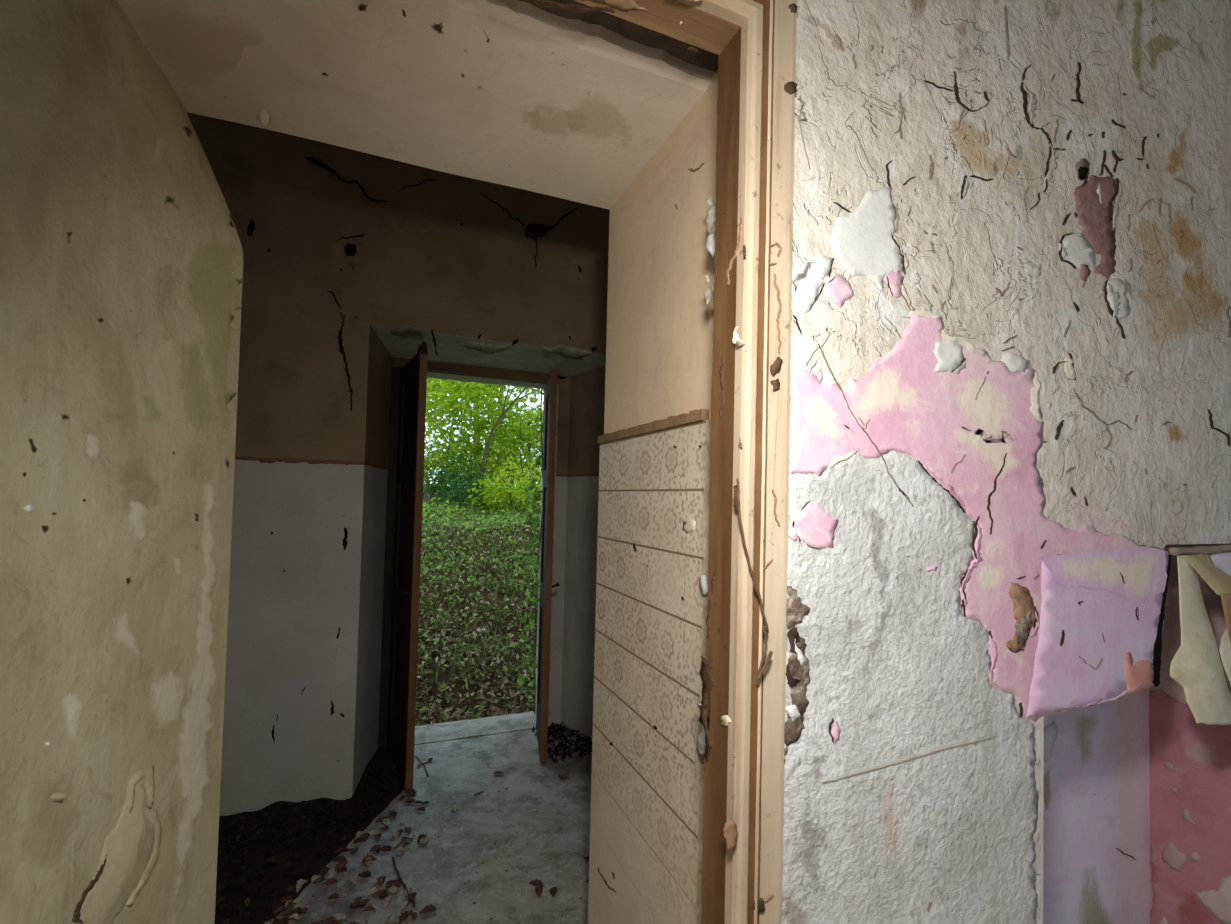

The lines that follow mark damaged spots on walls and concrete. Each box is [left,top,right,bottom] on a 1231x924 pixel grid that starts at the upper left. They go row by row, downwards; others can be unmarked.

crack [301,153,437,203]
water stain [509,86,642,159]
peeling [784,82,797,95]
water stain [801,14,857,69]
water stain [902,0,974,75]
water stain [935,110,1027,187]
water stain [1111,0,1212,111]
crack [247,219,255,236]
crack [327,291,353,412]
crack [1223,305,1231,338]
crack [1207,409,1231,447]
peeling [752,175,1231,924]